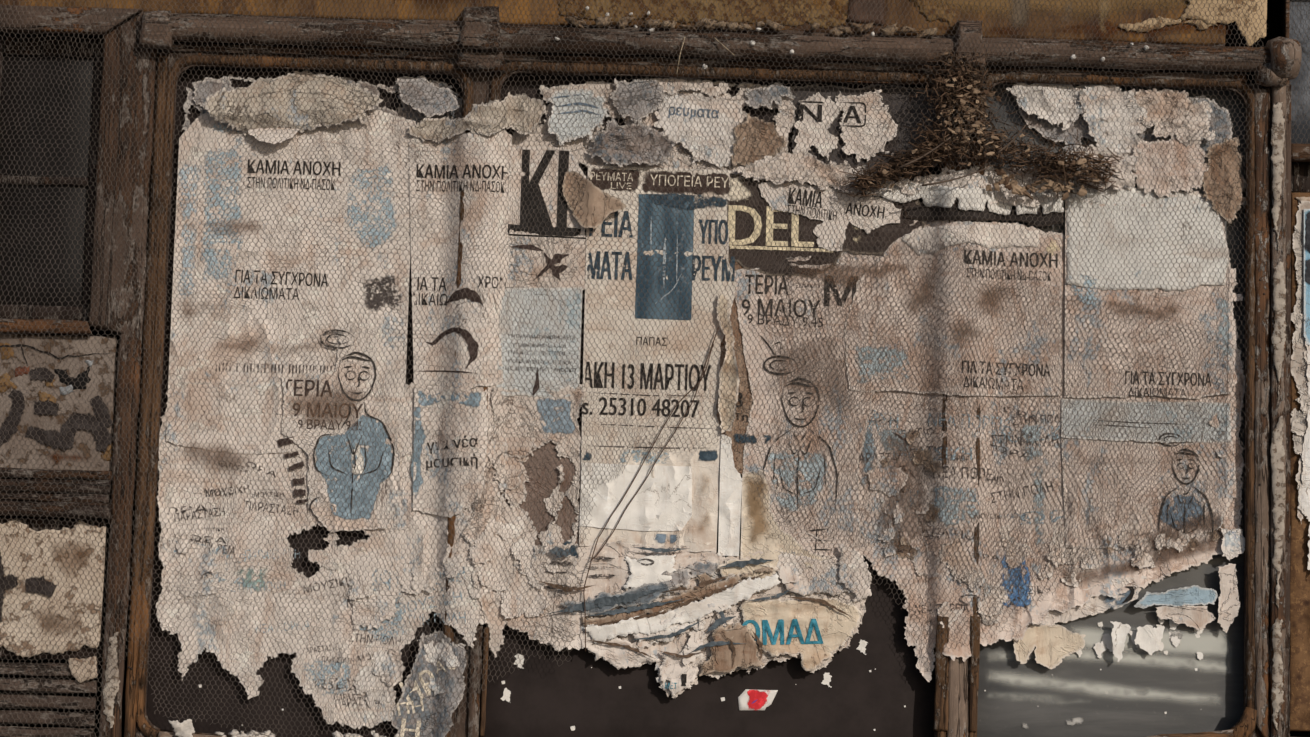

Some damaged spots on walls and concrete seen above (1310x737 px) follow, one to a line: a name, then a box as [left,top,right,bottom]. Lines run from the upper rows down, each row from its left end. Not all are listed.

peeling [559,0,956,38]
spalling [1119,0,1267,46]
flaking render [0,518,120,729]